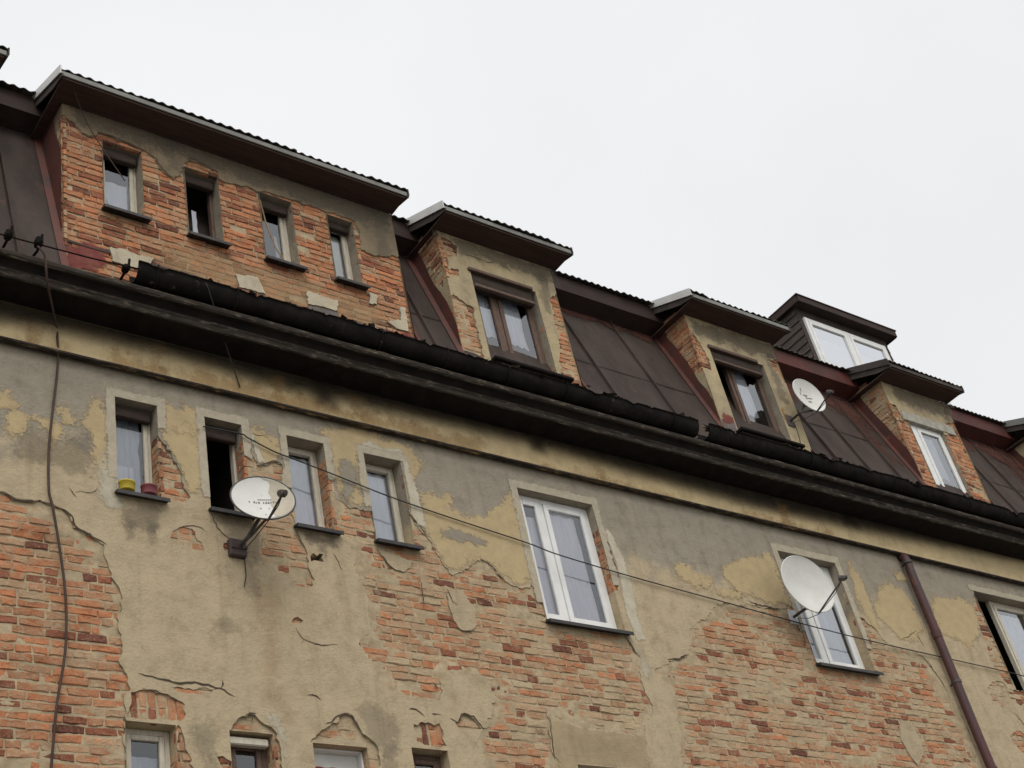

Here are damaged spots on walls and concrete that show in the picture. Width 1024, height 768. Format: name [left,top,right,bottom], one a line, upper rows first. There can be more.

flaking render [57,114,413,337]
flaking render [418,230,484,358]
flaking render [664,312,712,377]
flaking render [151,400,201,502]
flaking render [855,382,937,488]
flaking render [945,422,990,503]
flaking render [0,491,216,768]
crack [138,673,256,720]
flaking render [231,714,289,768]
flaking render [311,426,653,768]
flaking render [655,552,976,768]
flaking render [929,594,1024,707]